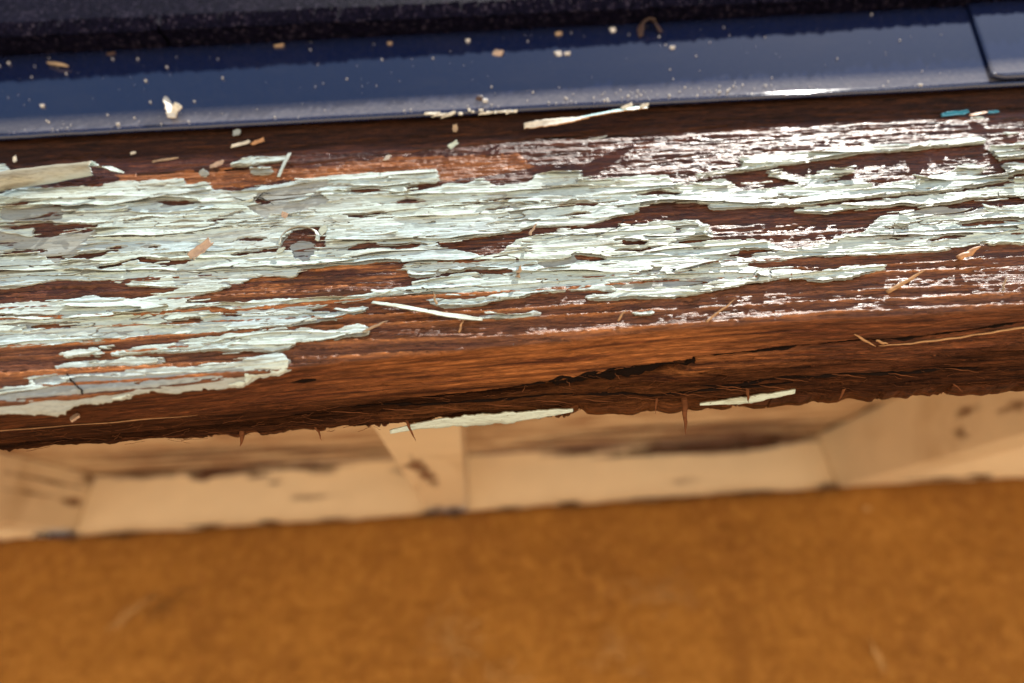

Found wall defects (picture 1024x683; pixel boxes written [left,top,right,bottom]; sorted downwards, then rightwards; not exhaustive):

peeling [524,102,649,129]
peeling [0,129,1024,417]
crack [331,367,979,414]